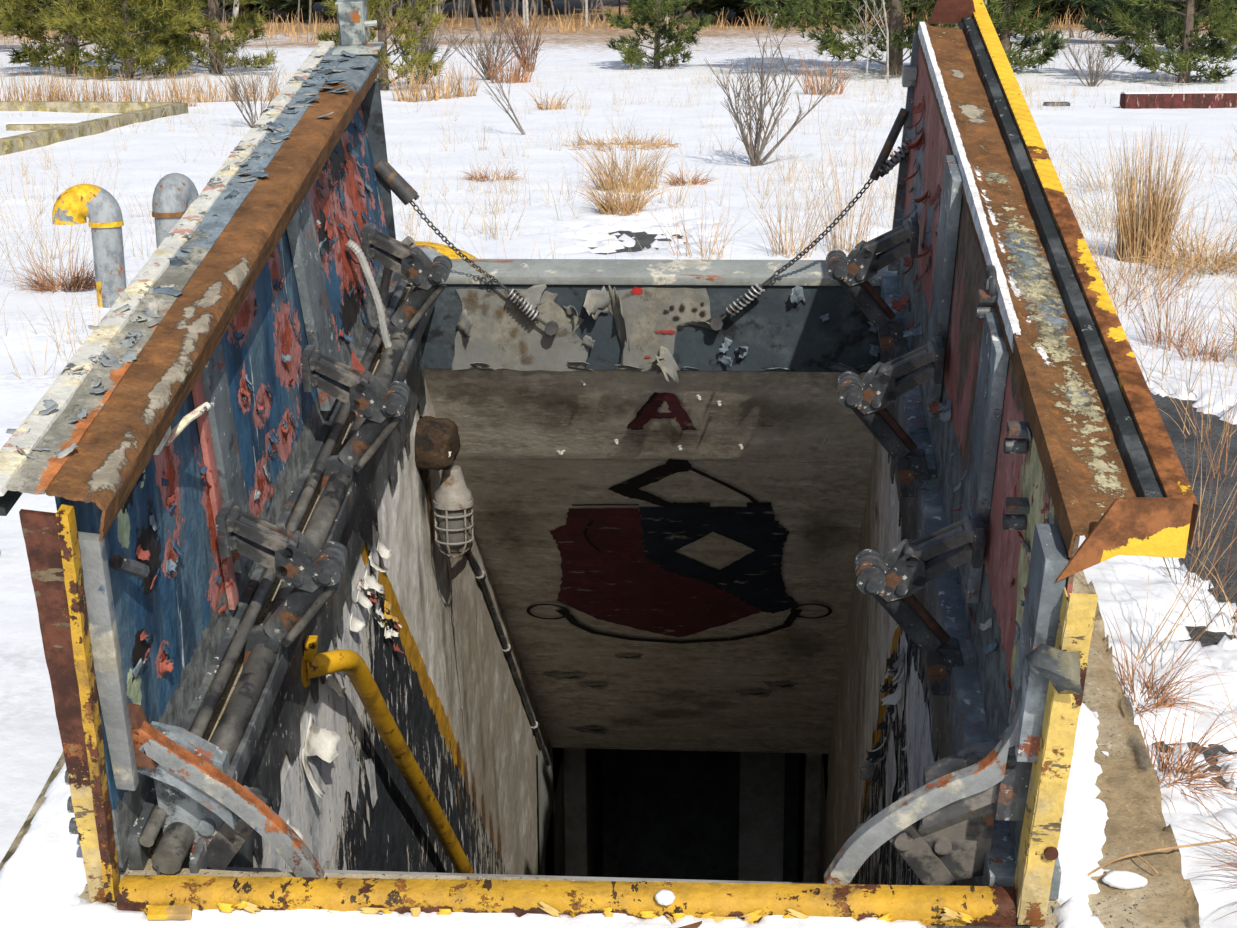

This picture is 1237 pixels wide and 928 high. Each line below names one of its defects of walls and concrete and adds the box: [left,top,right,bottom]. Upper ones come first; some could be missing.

peeling [211,50,369,200]
peeling [70,284,183,394]
peeling [157,228,199,268]
peeling [316,106,382,277]
peeling [452,284,748,386]
peeling [790,285,806,304]
peeling [891,96,942,337]
peeling [6,399,78,459]
peeling [135,539,184,590]
peeling [327,537,404,657]
peeling [132,629,174,679]
peeling [278,671,390,869]